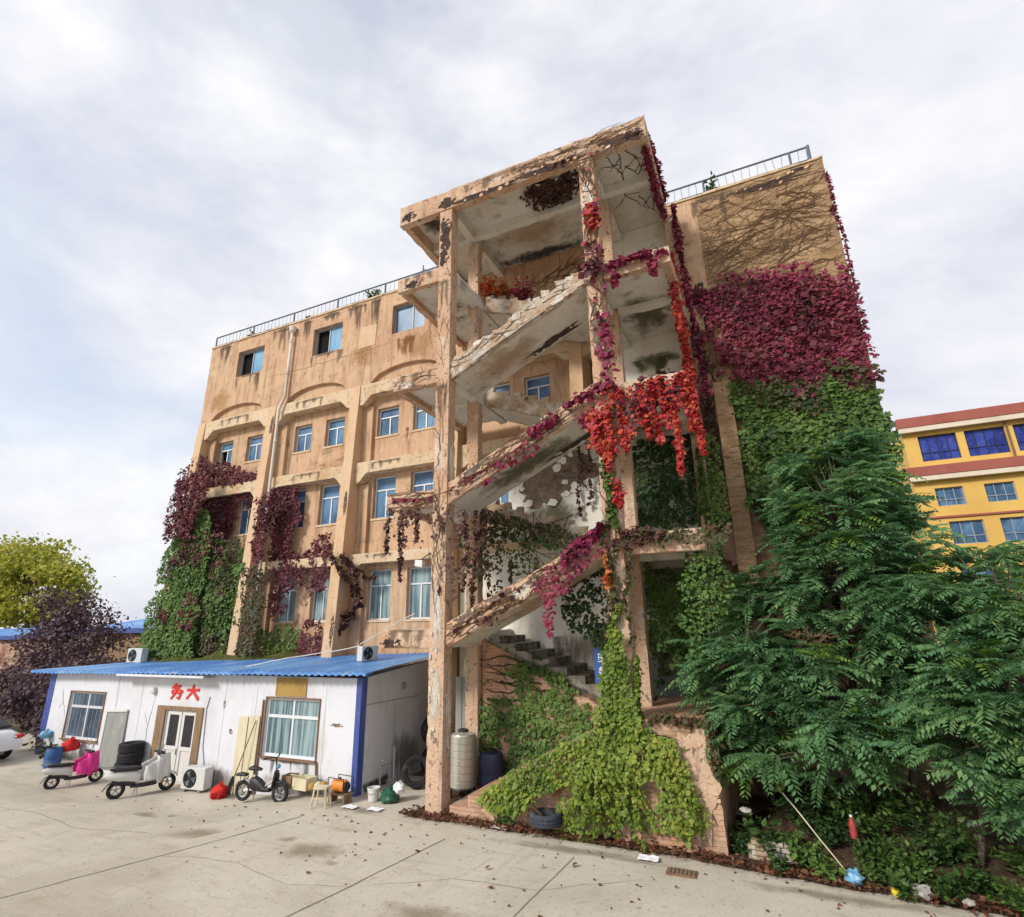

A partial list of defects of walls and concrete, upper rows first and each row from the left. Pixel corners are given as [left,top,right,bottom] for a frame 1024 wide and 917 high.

damp [325,299,380,323]
damp [629,298,667,327]
damp [633,355,668,373]
flaking render [519,429,605,509]